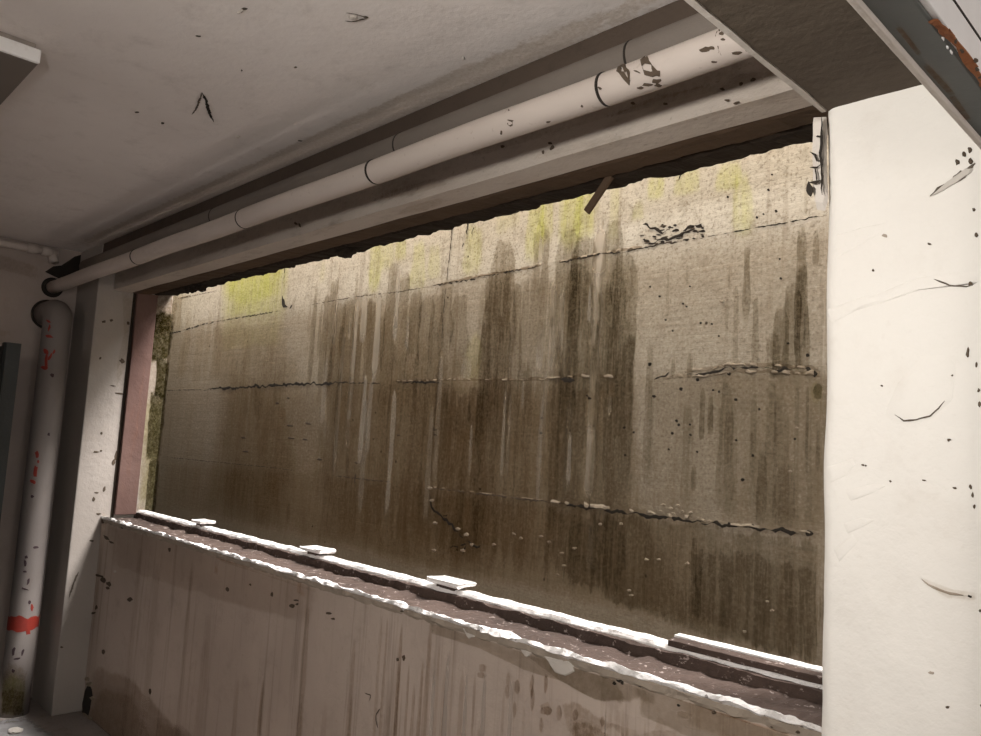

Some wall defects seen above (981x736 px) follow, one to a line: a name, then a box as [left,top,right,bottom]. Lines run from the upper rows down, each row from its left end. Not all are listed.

corrosion [928,19,981,87]
crack [192,92,214,122]
crack [930,147,975,197]
spalling [640,223,705,245]
crack [167,374,617,391]
spalling [654,353,820,391]
crack [427,486,819,553]